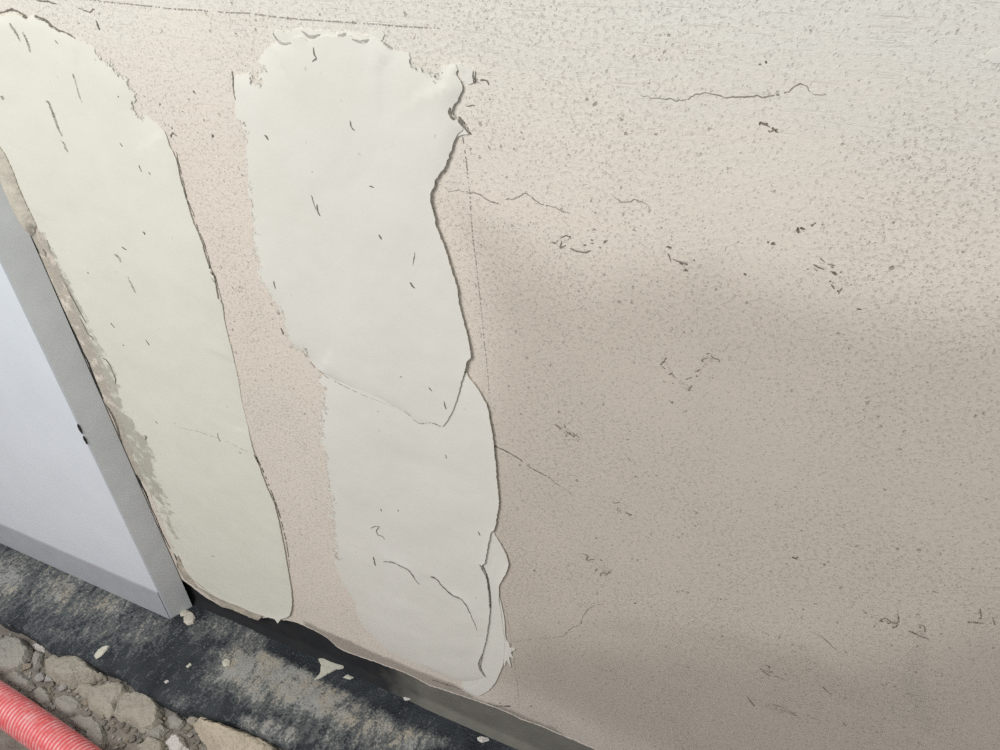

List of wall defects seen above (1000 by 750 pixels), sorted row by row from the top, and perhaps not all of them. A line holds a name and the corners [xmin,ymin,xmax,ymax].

flaking render [0,12,292,623]
flaking render [234,35,515,696]
crack [641,83,826,101]